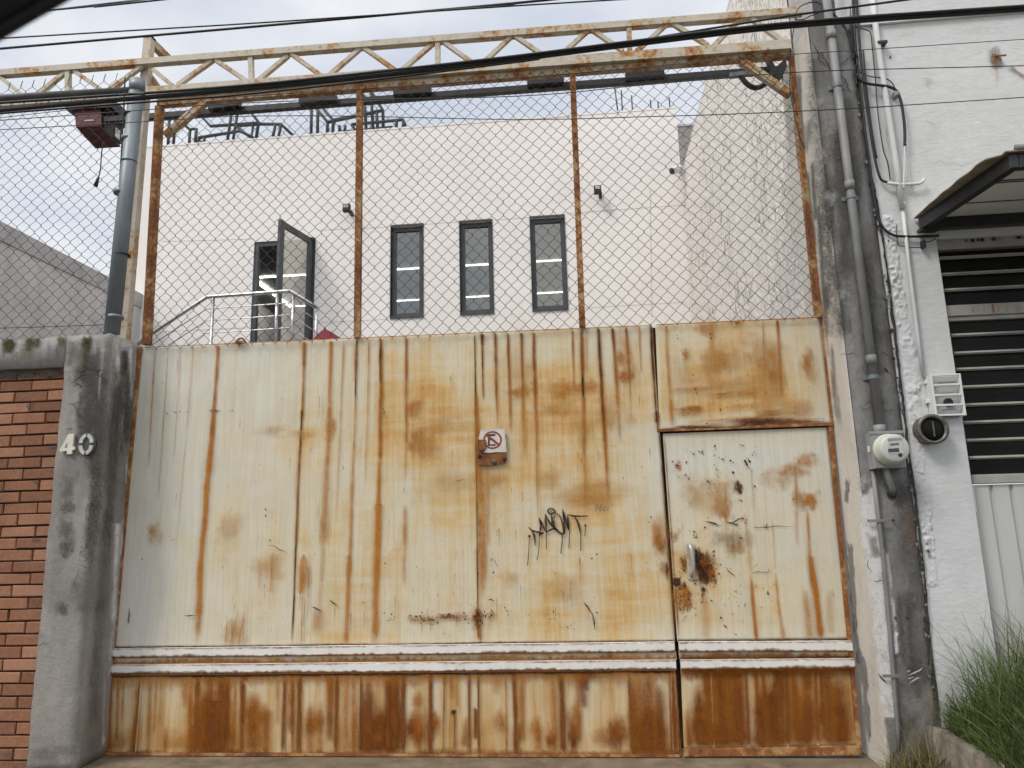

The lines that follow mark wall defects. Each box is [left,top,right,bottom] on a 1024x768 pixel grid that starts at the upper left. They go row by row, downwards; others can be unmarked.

leakage [808,55,860,334]
leakage [0,338,137,686]
rust [105,317,856,754]